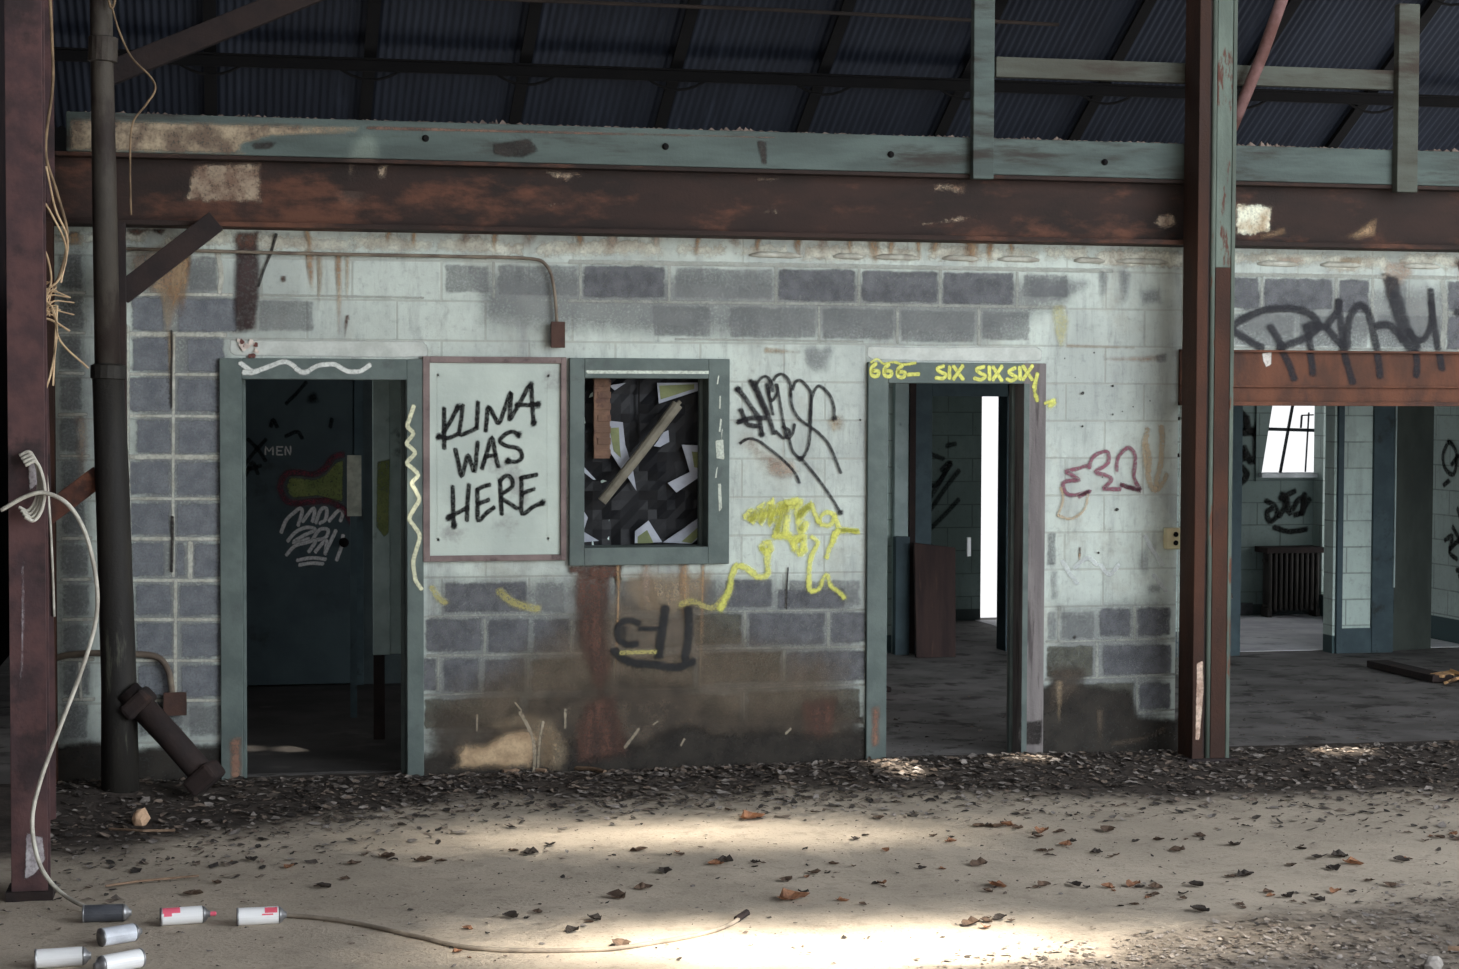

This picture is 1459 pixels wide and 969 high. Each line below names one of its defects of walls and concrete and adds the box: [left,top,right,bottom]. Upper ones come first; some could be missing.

peeling [187,163,260,202]
peeling [1236,204,1282,235]
rust [235,232,259,331]
rust [569,565,622,684]
water stain [424,602,865,776]